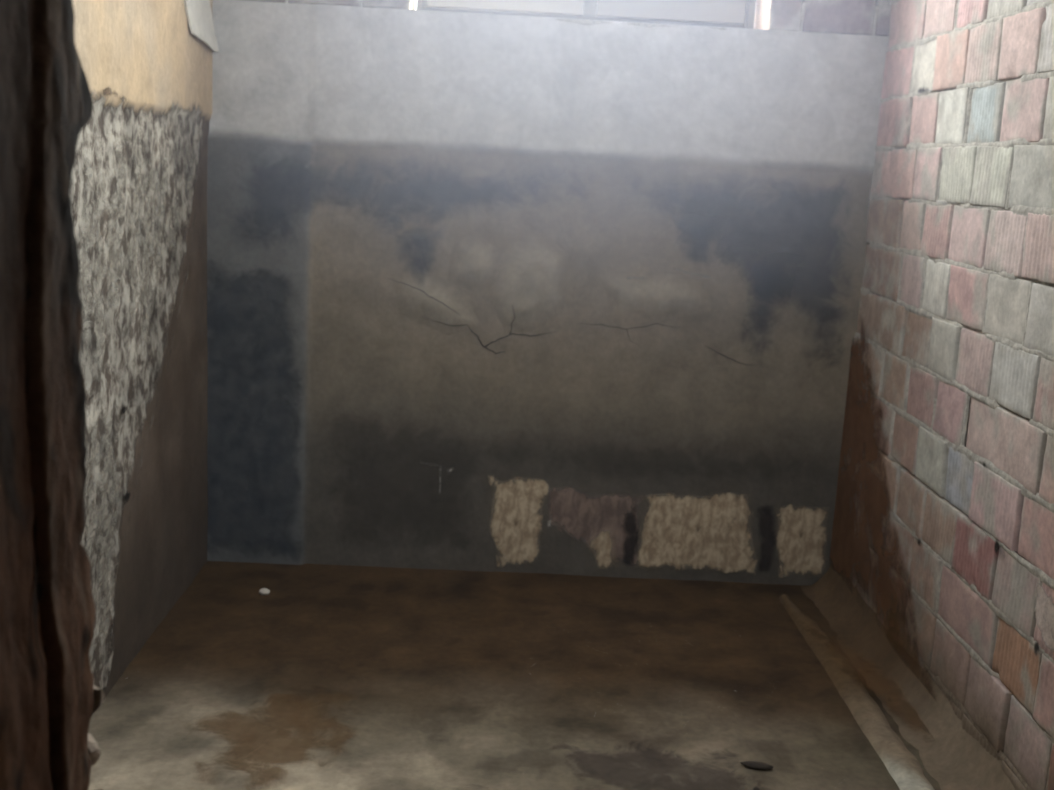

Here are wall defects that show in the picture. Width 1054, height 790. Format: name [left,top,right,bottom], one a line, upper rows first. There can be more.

flaking render [184,0,219,51]
crack [388,278,553,354]
peeling [489,475,757,573]
peeling [776,505,827,577]